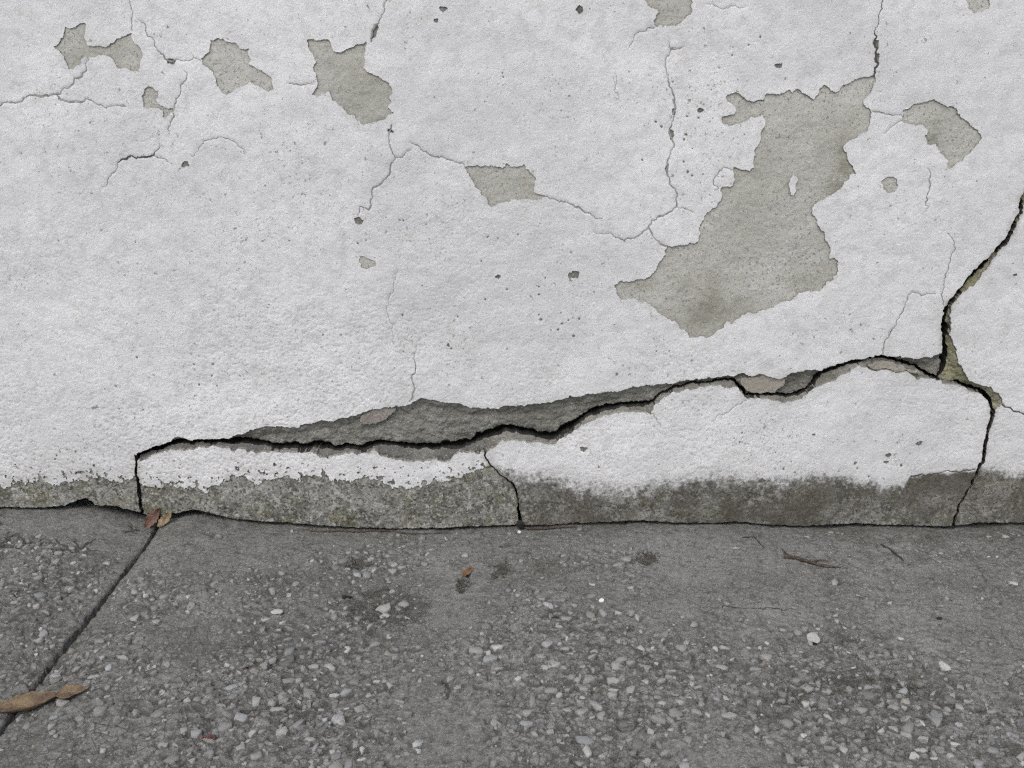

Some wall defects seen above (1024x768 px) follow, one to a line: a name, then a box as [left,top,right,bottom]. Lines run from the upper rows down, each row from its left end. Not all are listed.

crack [0,59,126,108]
peeling [54,23,143,71]
crack [102,0,200,188]
peeling [202,38,273,95]
peeling [307,25,394,133]
crack [873,0,883,77]
crack [544,27,693,247]
peeling [902,99,981,169]
peeling [464,163,545,207]
peeling [614,76,875,337]
crack [130,193,1024,533]
damp [498,468,1024,526]